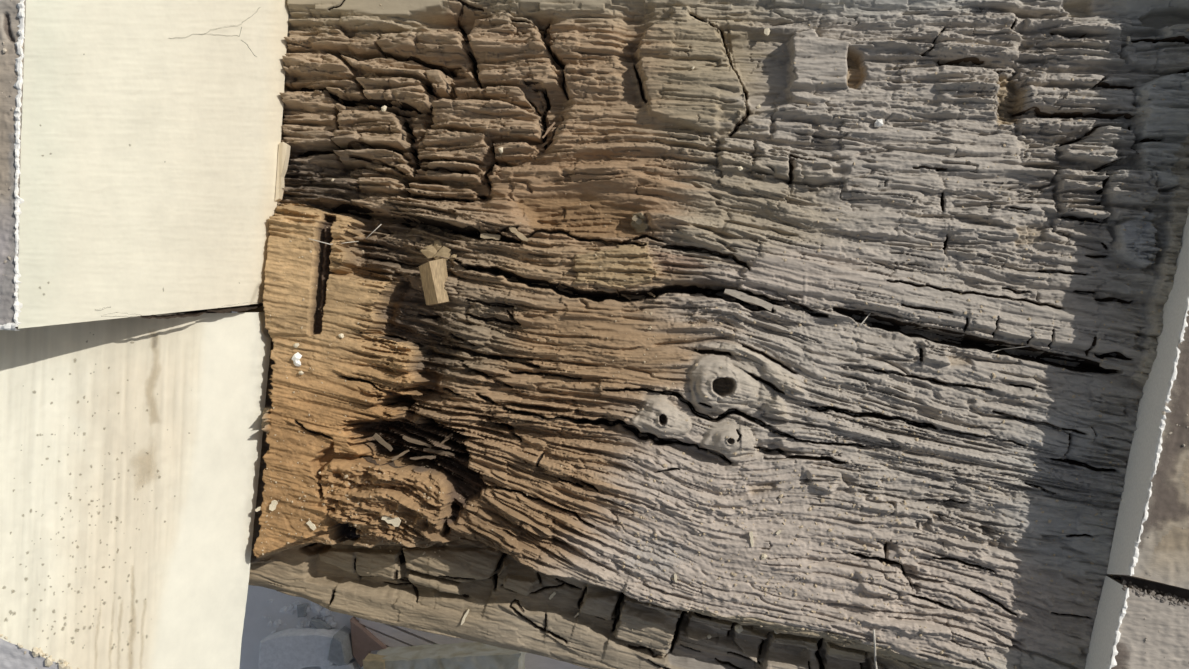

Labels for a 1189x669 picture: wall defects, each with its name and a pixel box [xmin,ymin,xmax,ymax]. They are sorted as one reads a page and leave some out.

crack [297,0,499,203]
crack [511,19,569,150]
crack [690,14,749,137]
crack [377,259,419,268]
crack [536,230,750,270]
crack [360,299,1116,526]
water stain [1142,316,1189,533]
crack [354,546,419,601]
crack [444,553,587,642]
crack [611,592,769,669]
crack [808,638,824,669]